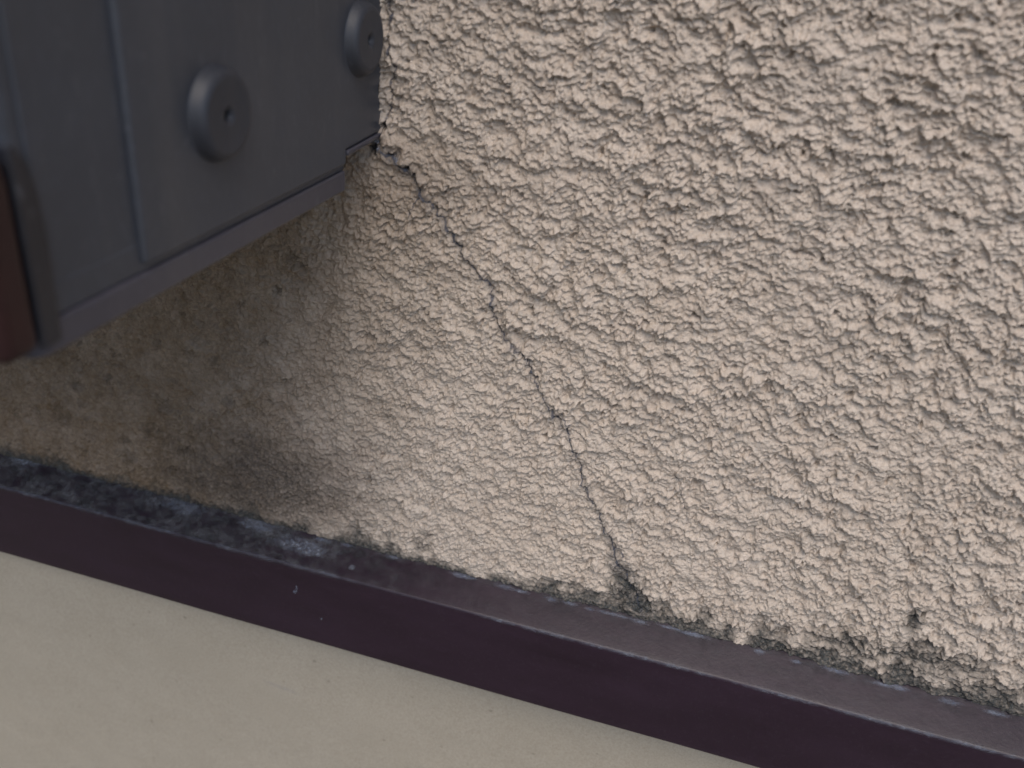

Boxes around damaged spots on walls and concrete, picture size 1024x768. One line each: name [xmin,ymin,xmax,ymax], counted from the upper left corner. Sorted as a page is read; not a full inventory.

crack [379,1,644,616]
damp [326,528,472,577]
damp [489,571,733,641]
damp [748,610,1024,717]